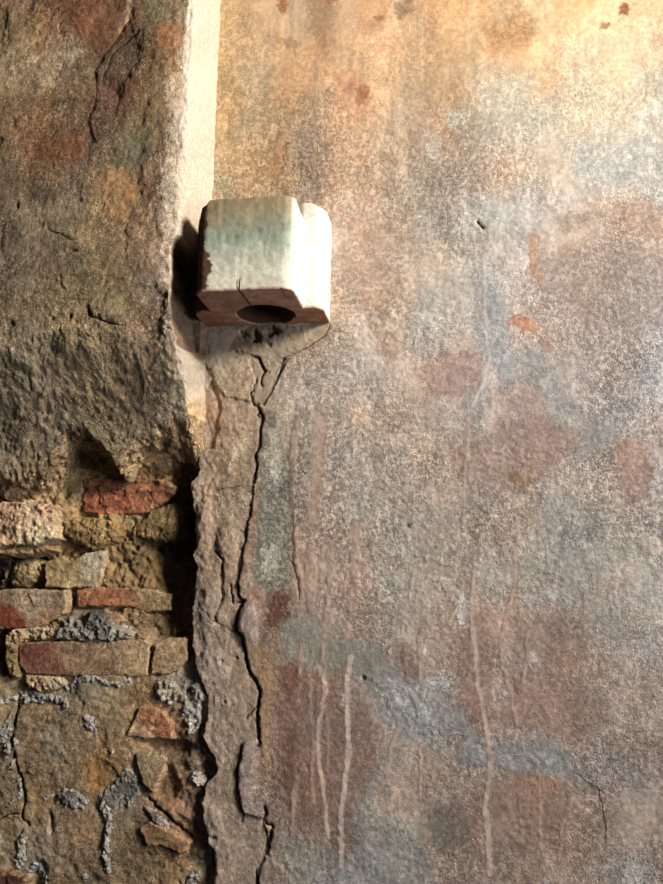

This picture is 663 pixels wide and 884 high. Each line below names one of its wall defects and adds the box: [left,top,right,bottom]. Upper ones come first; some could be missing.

crack [89,21,137,143]
water stain [356,0,390,36]
water stain [438,0,548,131]
water stain [558,94,663,239]
water stain [527,233,546,290]
crack [216,323,331,491]
spalling [0,323,328,884]
crack [292,516,301,600]
crack [0,698,29,824]
crack [200,509,274,884]
water stain [278,522,578,884]
water stain [612,853,648,884]